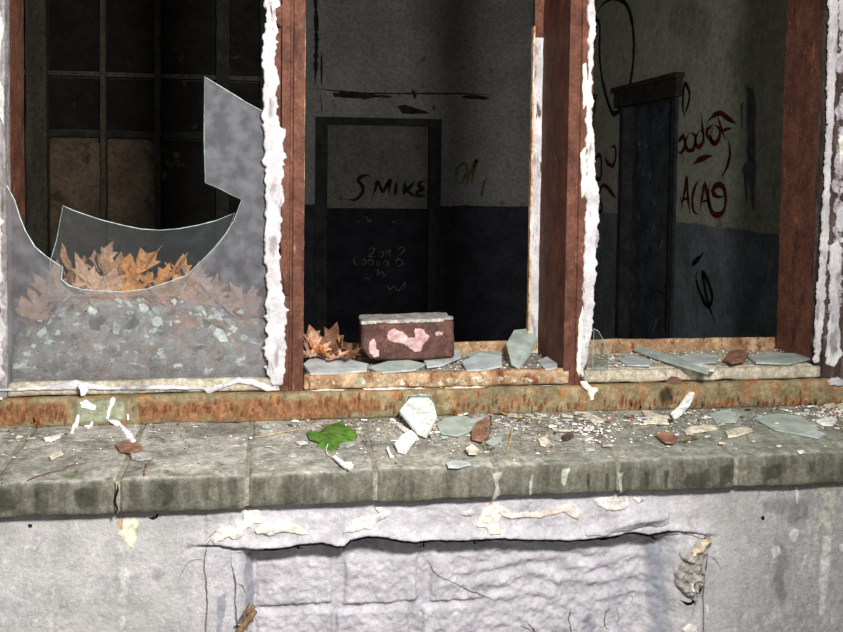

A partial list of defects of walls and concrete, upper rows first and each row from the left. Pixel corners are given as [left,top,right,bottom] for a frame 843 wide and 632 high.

corrosion [0,402,67,429]
corrosion [132,392,403,421]
corrosion [451,394,580,416]
corrosion [604,394,841,412]
leakage [76,488,96,508]
leakage [492,473,501,499]
peeling [462,501,580,535]
leakage [811,484,843,615]
crack [178,531,216,632]
crack [230,531,720,632]
flaking render [674,535,713,618]
flaking render [681,624,698,632]